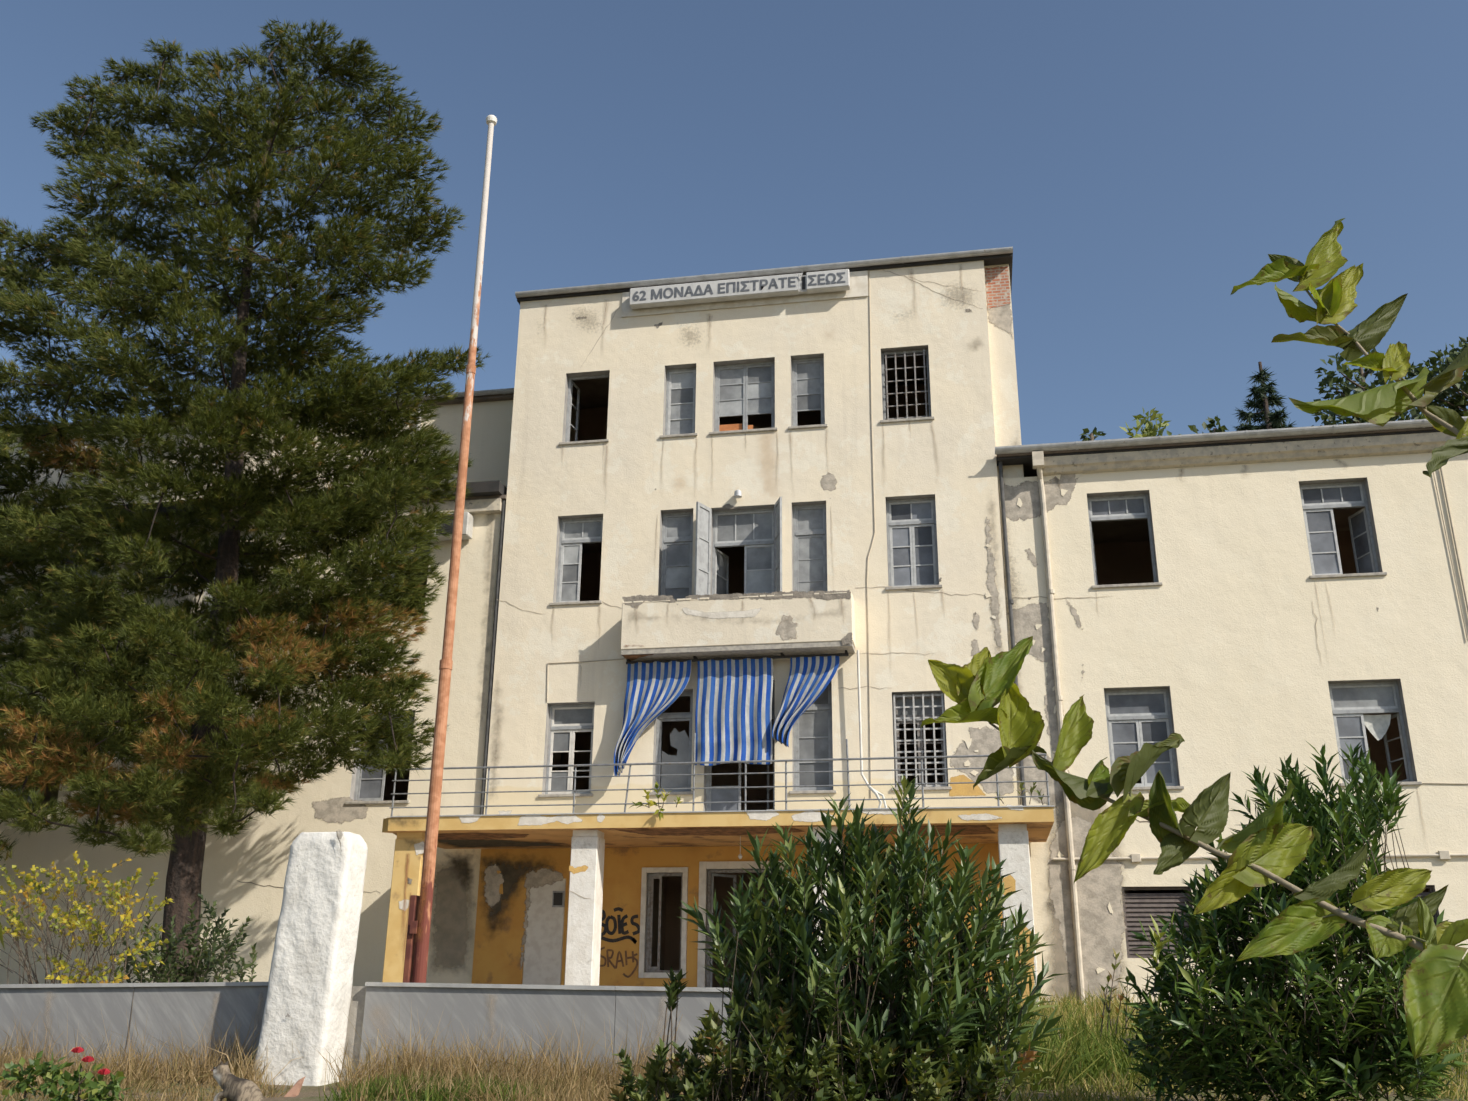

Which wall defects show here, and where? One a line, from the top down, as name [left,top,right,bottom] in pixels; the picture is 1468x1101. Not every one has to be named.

spalling [622,590,851,640]
peeling [862,473,1127,1005]
spalling [414,809,835,855]
peeling [484,864,504,908]
water stain [432,839,565,969]
peeling [520,865,588,967]